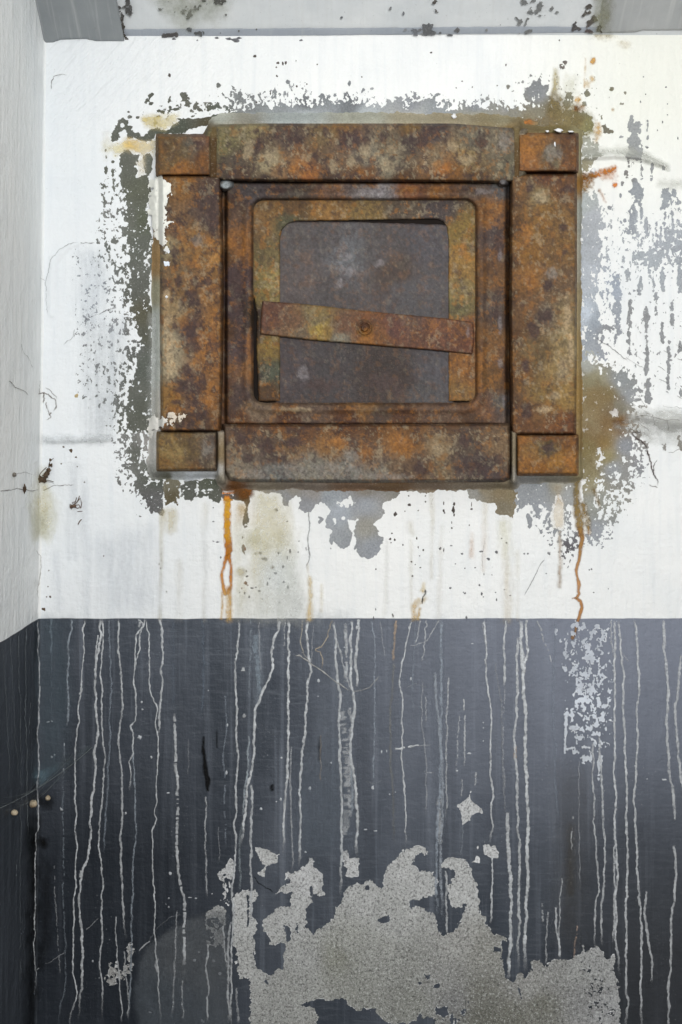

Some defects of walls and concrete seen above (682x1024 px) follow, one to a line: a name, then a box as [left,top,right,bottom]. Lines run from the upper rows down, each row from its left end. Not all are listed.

peeling [158,0,241,42]
peeling [403,0,460,36]
rust [582,167,617,191]
peeling [72,61,682,599]
rust [220,489,252,618]
rust [571,480,599,640]
leakage [66,601,375,1024]
leakage [475,620,551,972]
peeling [564,679,614,781]
leakage [592,622,653,1009]
spalling [205,844,621,1024]
leakage [667,847,677,1022]